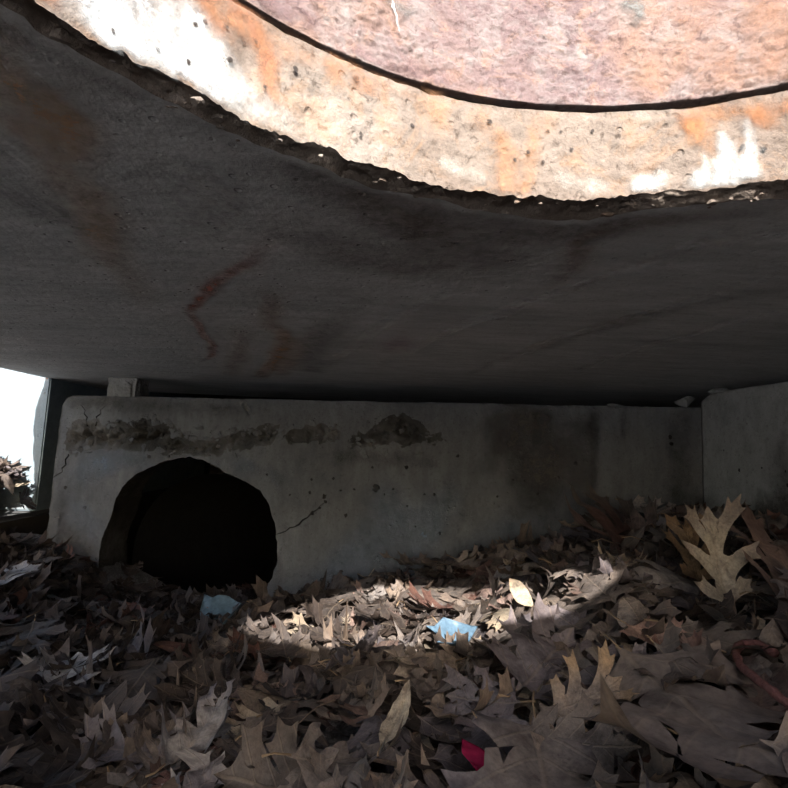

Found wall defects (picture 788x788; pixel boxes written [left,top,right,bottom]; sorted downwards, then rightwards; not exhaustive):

efflorescence [633,177,658,189]
efflorescence [695,138,757,185]
spalling [62,412,448,460]
crack [276,501,326,535]